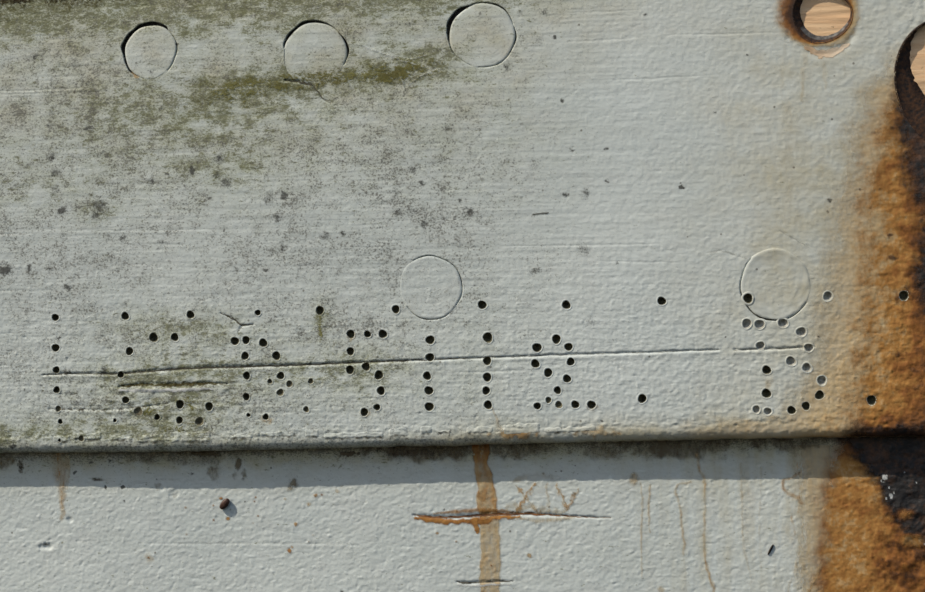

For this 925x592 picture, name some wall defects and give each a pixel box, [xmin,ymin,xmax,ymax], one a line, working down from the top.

corrosion [779,0,859,59]
corrosion [699,67,925,592]
damp [377,446,472,463]
corrosion [472,434,501,592]
crack [414,509,598,534]